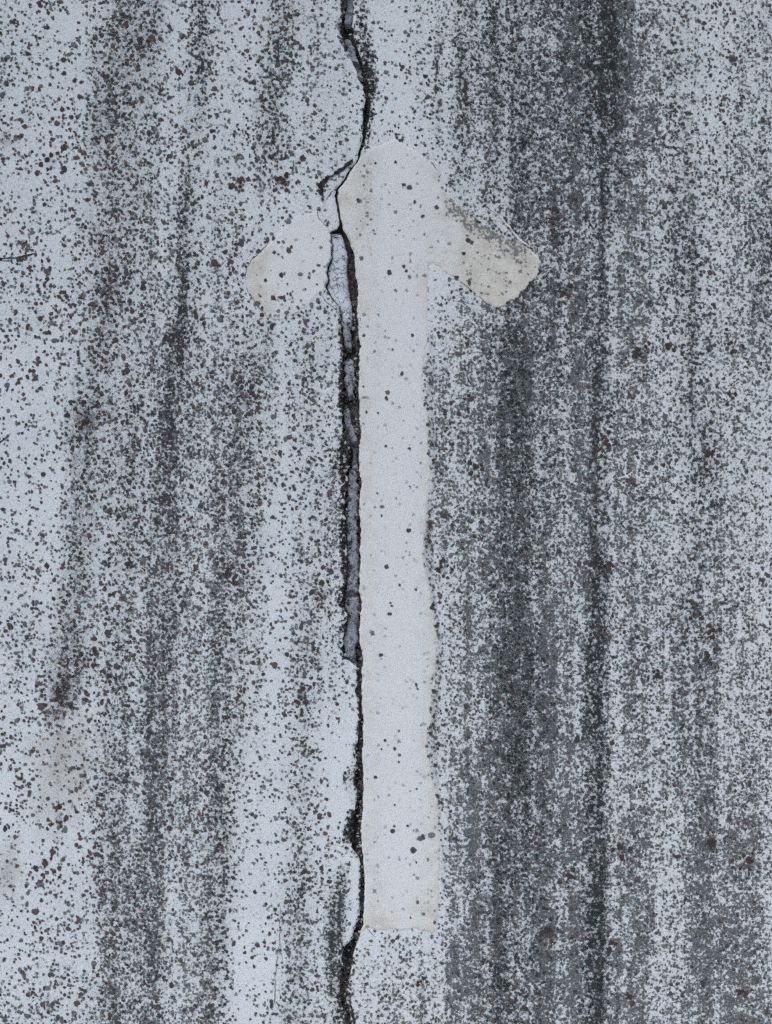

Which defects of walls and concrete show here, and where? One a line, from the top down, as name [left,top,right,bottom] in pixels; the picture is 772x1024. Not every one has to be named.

crack [316,0,374,1024]